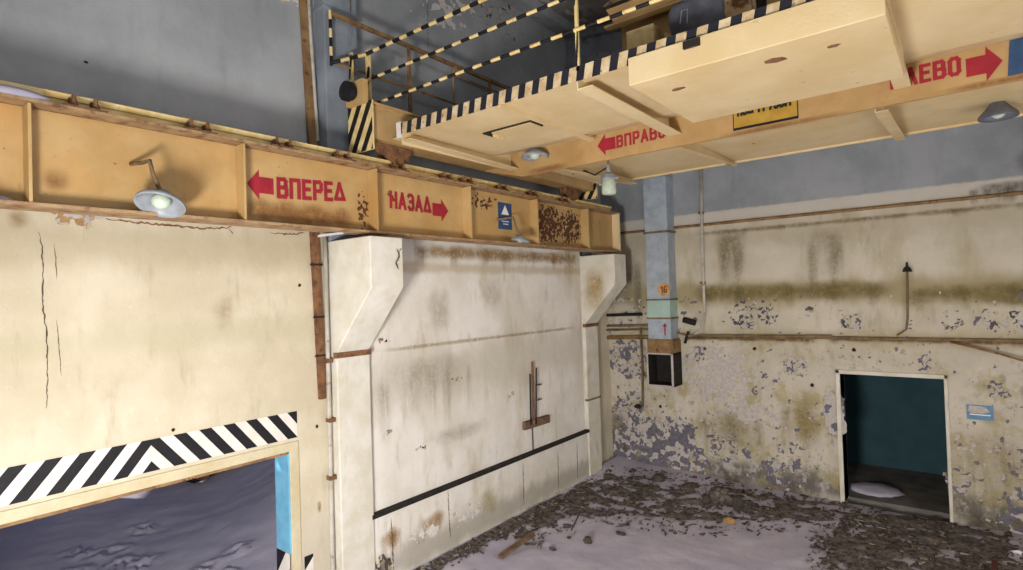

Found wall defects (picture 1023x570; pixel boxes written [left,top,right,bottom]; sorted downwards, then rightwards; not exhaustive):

peeling [418,0,523,48]
corrosion [431,203,581,262]
crack [38,232,62,407]
damp [705,284,877,298]
peeling [828,289,1023,373]
damp [928,286,1023,301]
peeling [608,294,847,491]
peeling [942,371,1023,534]